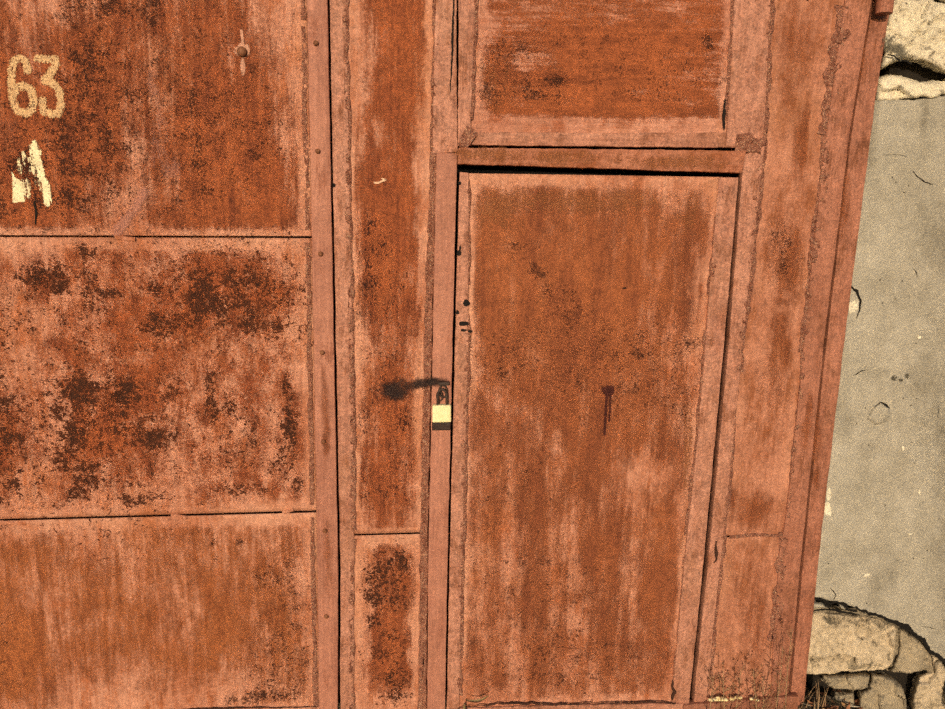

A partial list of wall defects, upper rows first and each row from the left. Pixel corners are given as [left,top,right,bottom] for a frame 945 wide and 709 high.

spalling [807,597,945,709]